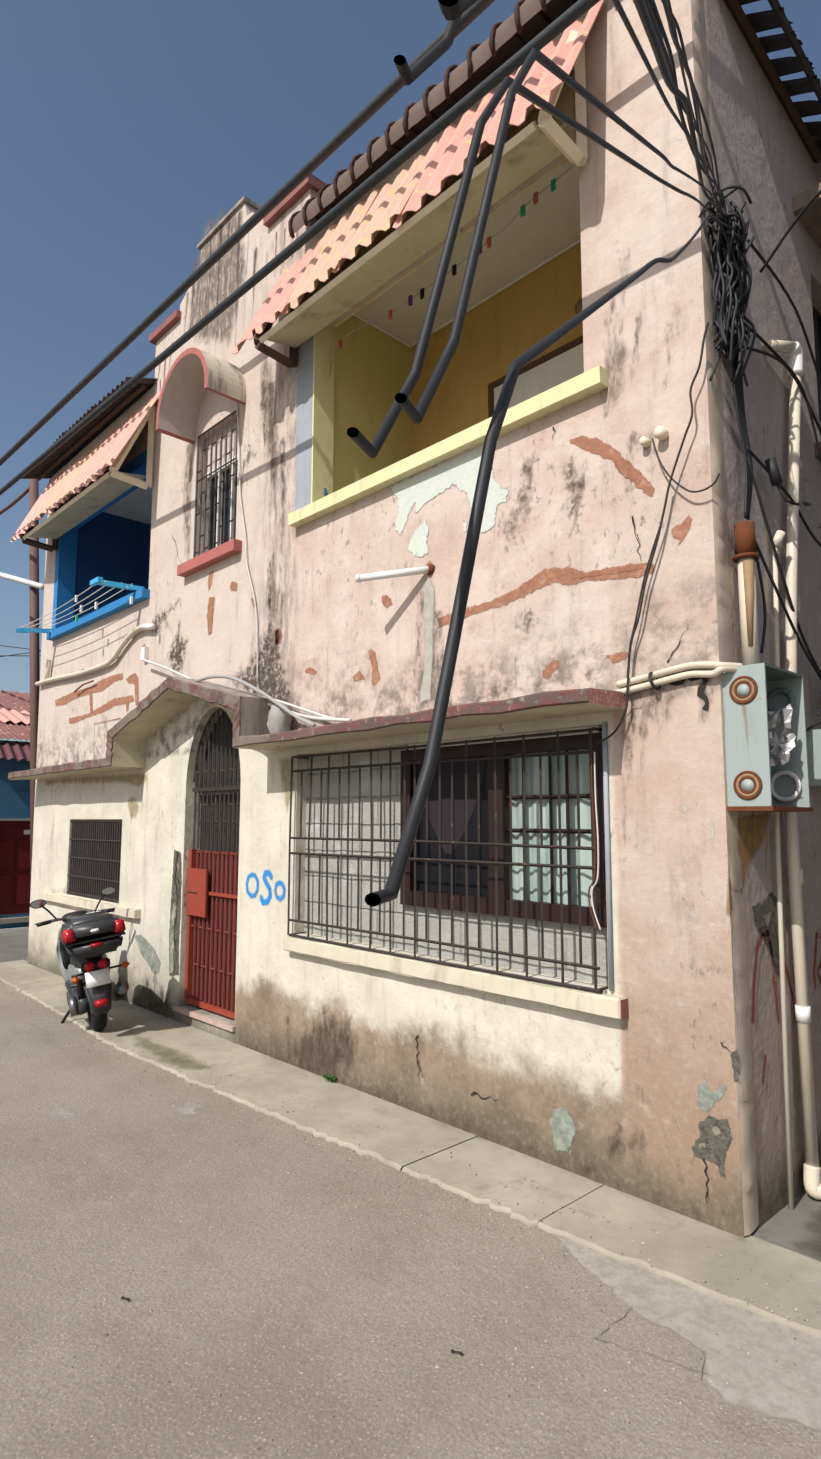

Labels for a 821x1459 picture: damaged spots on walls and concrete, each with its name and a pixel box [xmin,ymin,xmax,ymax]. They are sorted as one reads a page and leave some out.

damp [261,363,285,527]
peeling [390,443,508,557]
damp [238,563,292,708]
damp [301,1012,353,1075]
peeling [550,1107,576,1155]
spalling [691,1051,740,1179]